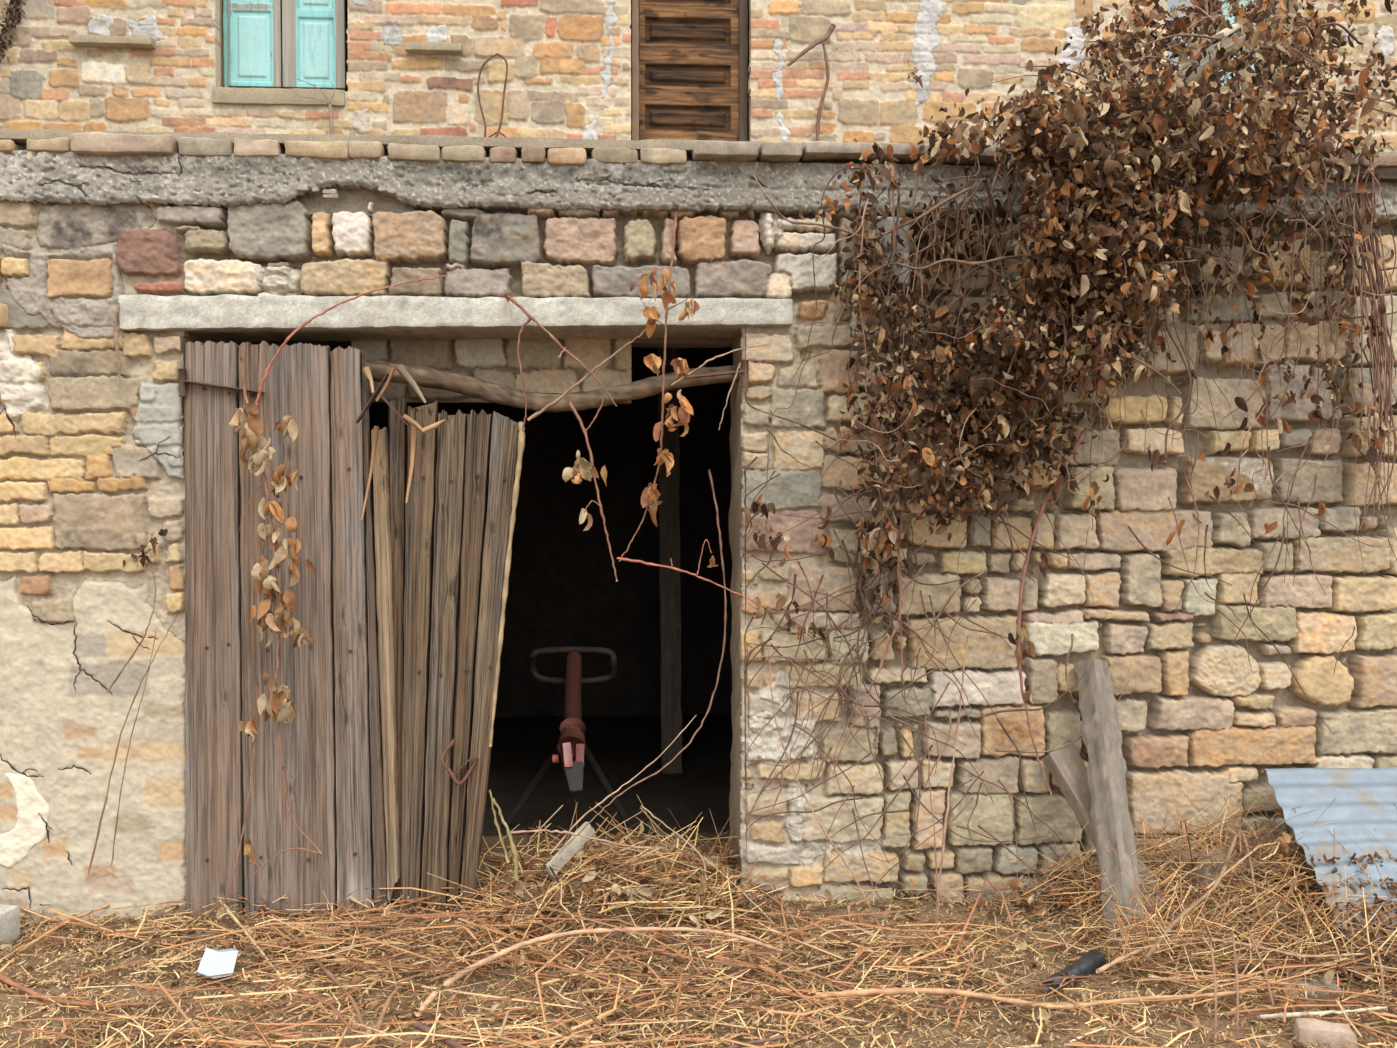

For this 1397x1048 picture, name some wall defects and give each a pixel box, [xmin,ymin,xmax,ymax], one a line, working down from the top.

crack [27,606,157,695]